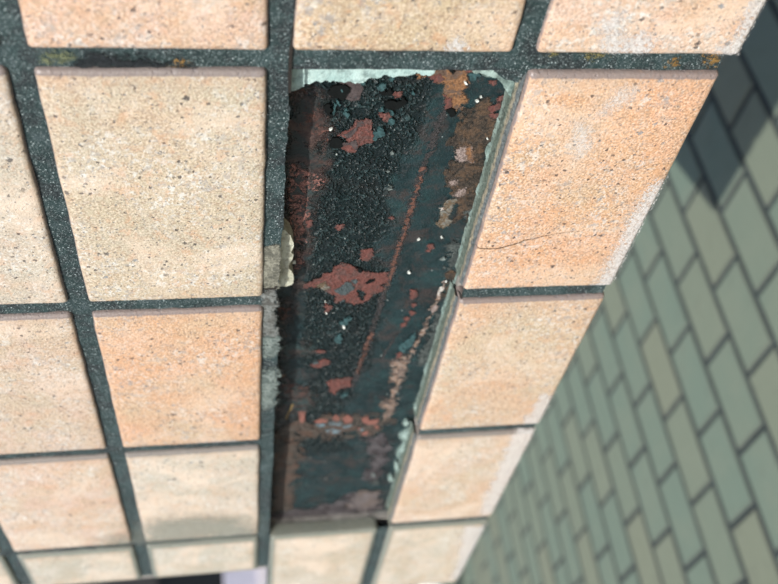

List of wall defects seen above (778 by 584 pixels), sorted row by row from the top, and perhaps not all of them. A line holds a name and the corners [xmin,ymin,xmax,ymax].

peeling [428,70,497,86]
peeling [323,77,415,153]
peeling [444,95,456,118]
rust [416,70,497,229]
crack [475,231,578,250]
peeling [303,248,389,314]
rust [270,85,446,519]
peeling [400,289,418,328]
peeling [260,245,281,412]
peeling [334,315,352,344]
peeling [310,339,330,369]
peeling [326,377,353,398]